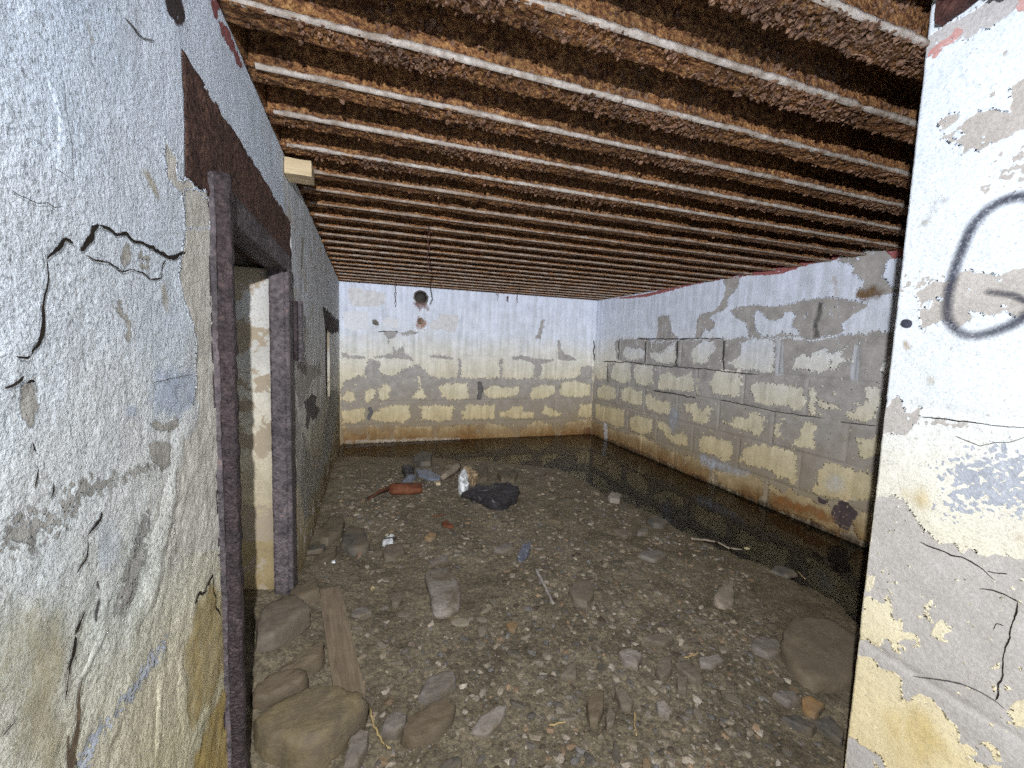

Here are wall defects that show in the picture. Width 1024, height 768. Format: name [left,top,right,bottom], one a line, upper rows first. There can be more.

peeling [936,76,1024,195]
crack [4,224,186,389]
spalling [0,136,220,575]
peeling [295,249,1024,768]
water stain [592,424,870,553]
crack [924,417,1024,446]
crack [65,512,103,768]
crack [914,542,1018,707]